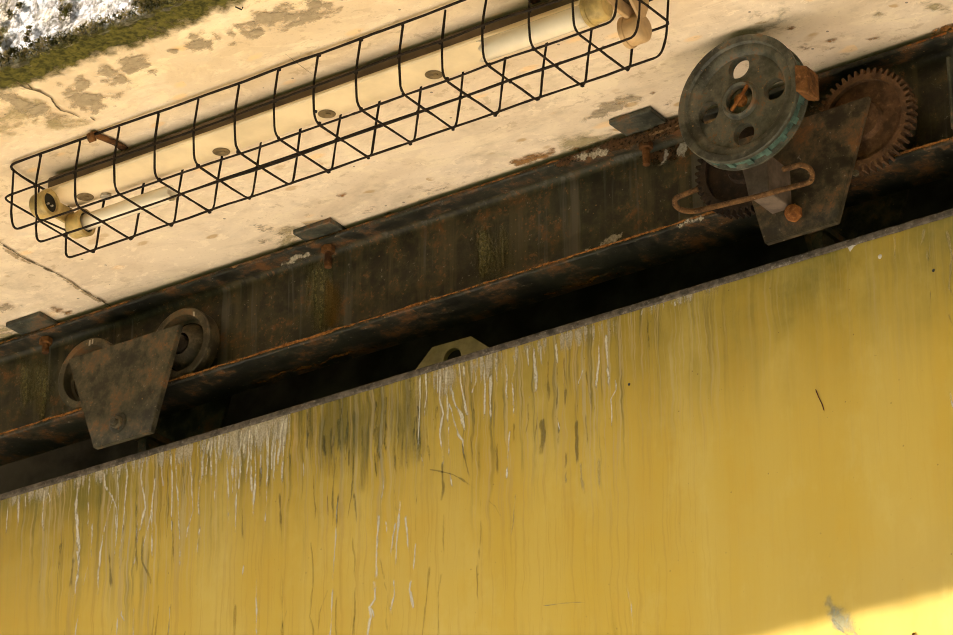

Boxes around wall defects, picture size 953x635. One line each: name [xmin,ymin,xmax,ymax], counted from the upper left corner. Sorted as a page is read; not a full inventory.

rust [907,24,953,46]
rust [415,117,687,208]
rust [893,138,951,157]
crack [0,243,110,306]
rust [168,211,715,384]
rust [0,408,82,435]
water stain [418,353,514,454]
water stain [513,326,617,423]
water stain [6,483,62,528]
water stain [74,414,290,592]